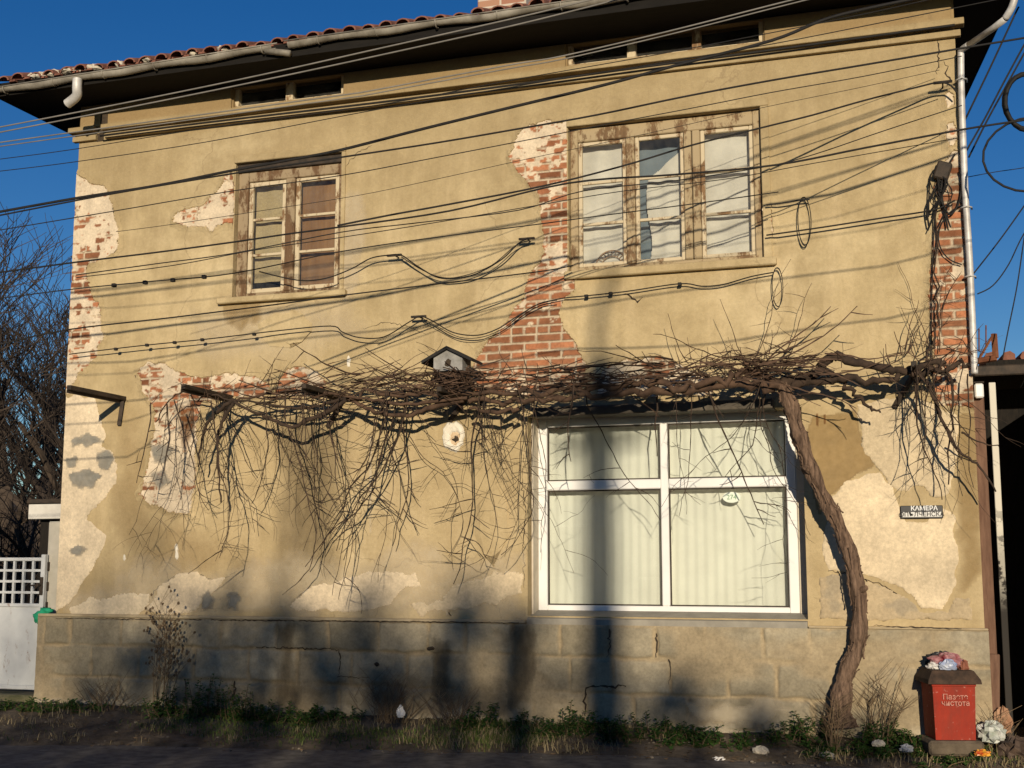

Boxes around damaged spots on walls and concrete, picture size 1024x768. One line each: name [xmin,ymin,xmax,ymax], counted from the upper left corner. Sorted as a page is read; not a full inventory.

flaking render [167,165,235,238]
flaking render [468,114,719,404]
flaking render [56,169,225,615]
flaking render [132,355,333,522]
peeling [819,85,974,622]
peeling [290,571,421,613]
crack [582,684,626,715]